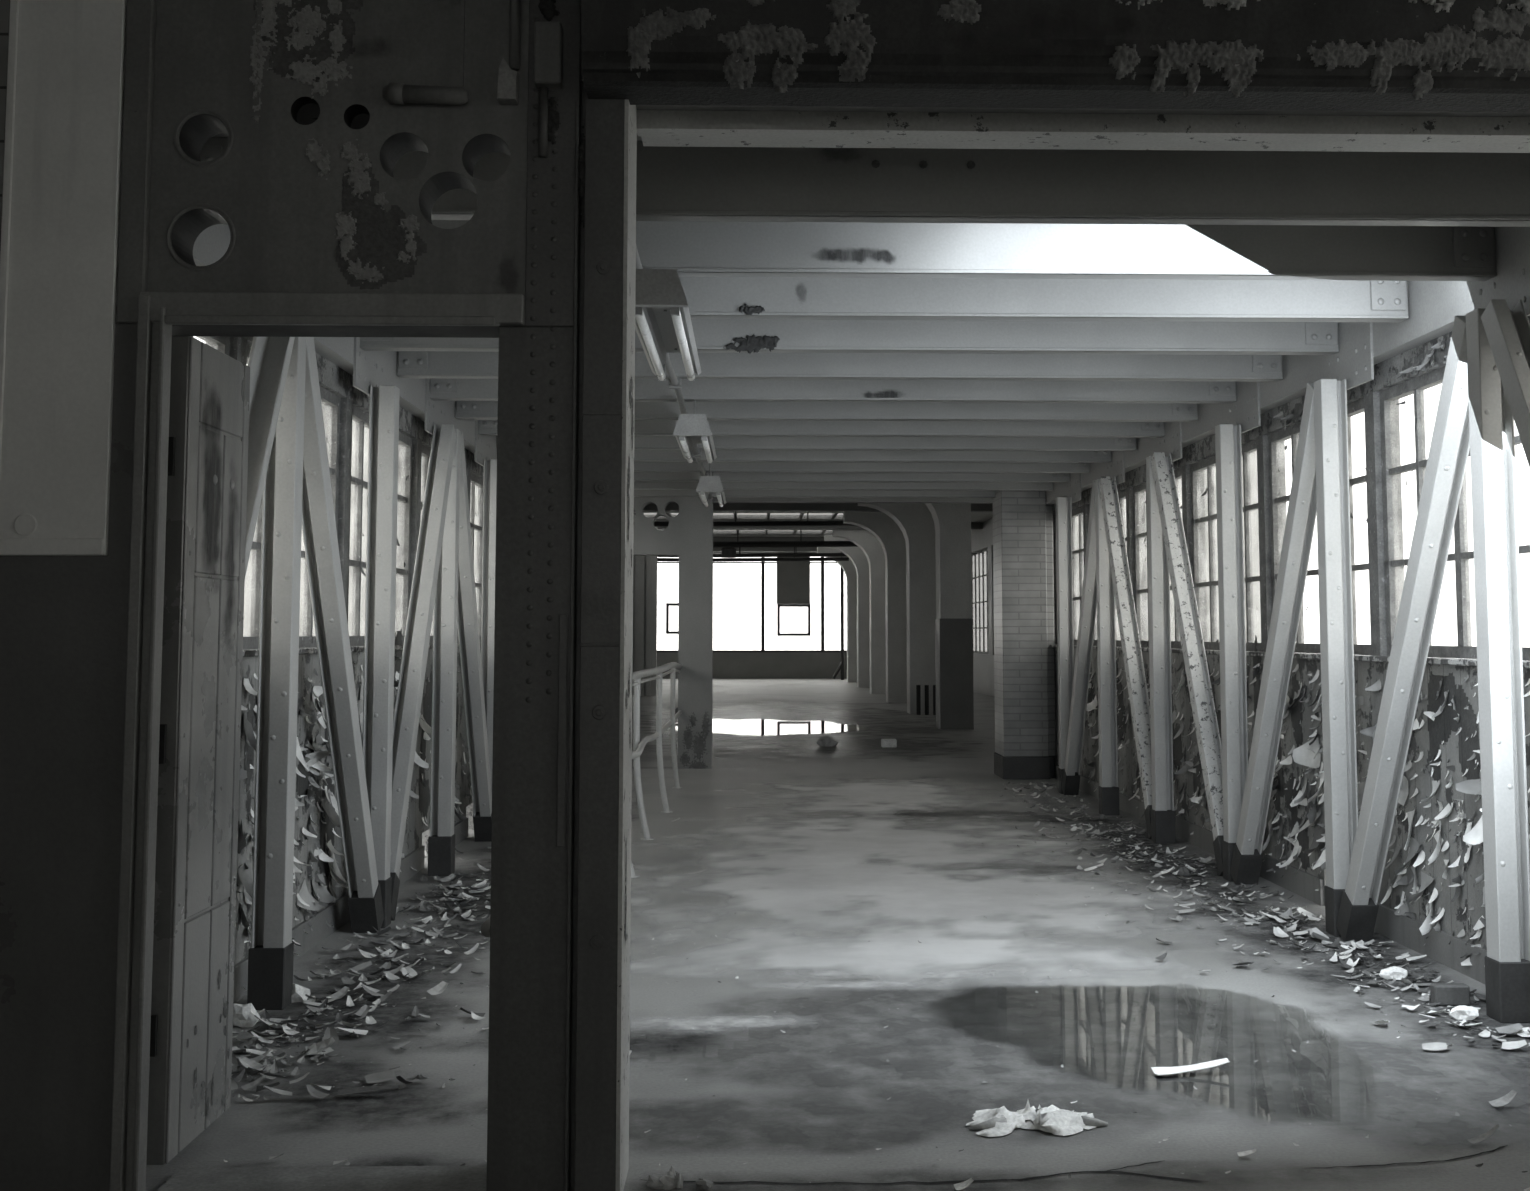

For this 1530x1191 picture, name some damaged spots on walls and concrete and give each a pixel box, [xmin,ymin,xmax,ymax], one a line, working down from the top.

peeling [249,0,363,124]
peeling [626,0,877,93]
peeling [1109,39,1264,98]
peeling [1297,0,1530,102]
peeling [235,673,258,943]
peeling [292,669,348,956]
peeling [393,628,403,717]
peeling [1172,661,1212,835]
peeling [1246,635,1261,730]
peeling [1262,664,1326,891]
peeling [1355,670,1387,814]
peeling [1381,671,1487,967]